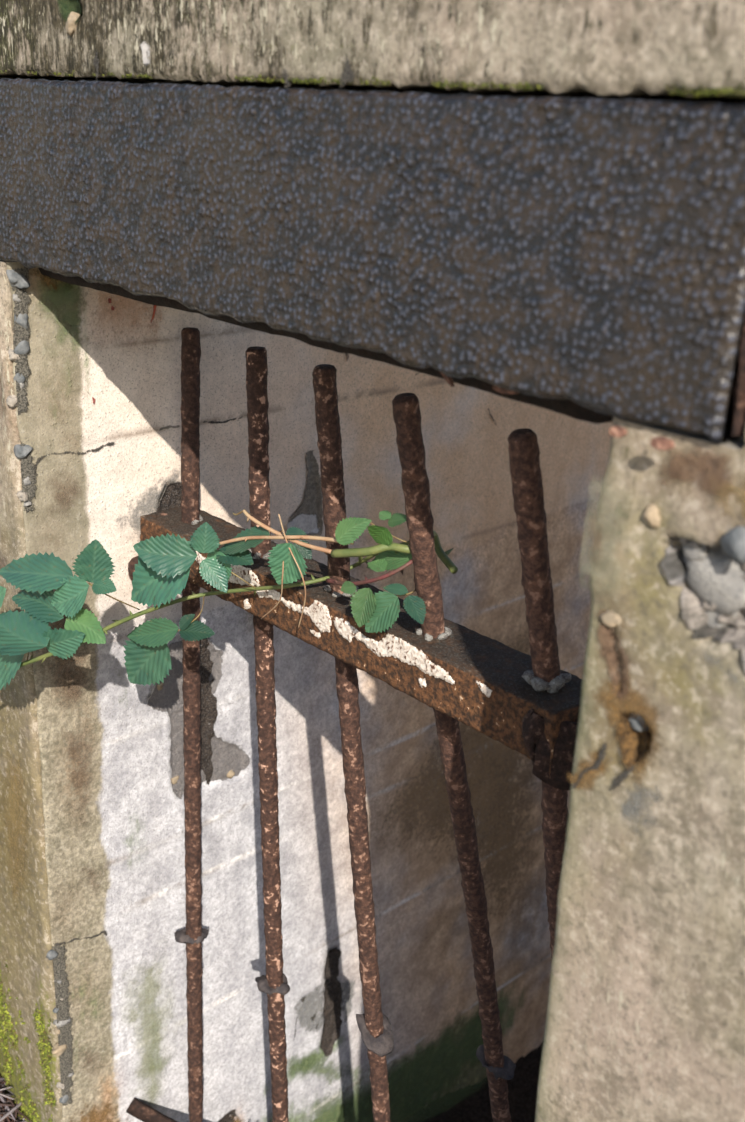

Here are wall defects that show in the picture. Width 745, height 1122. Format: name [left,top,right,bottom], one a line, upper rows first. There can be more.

spalling [147,640,184,799]
spalling [200,638,250,785]
rust [597,610,630,699]
spalling [661,525,745,669]
spalling [294,947,355,1057]